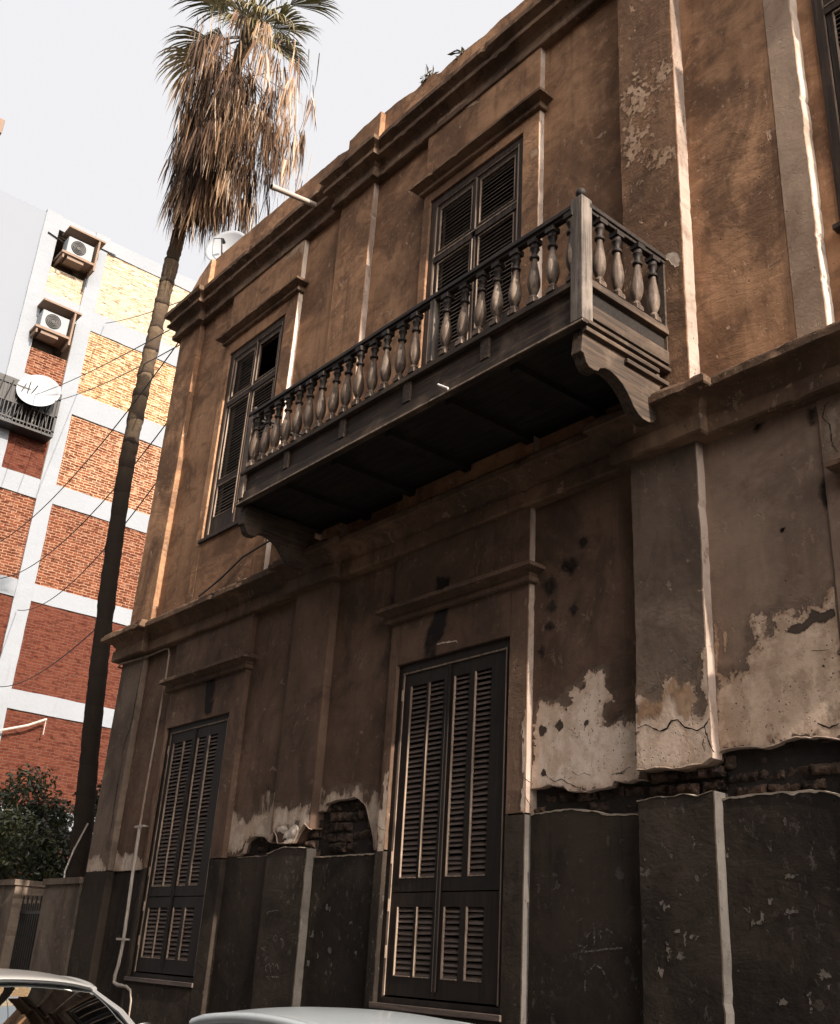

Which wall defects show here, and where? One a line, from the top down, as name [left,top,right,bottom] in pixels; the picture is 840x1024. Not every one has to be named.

peeling [619,57,677,171]
damp [424,608,448,658]
crack [638,719,714,752]
peeling [520,586,840,816]
flaking render [228,771,389,858]